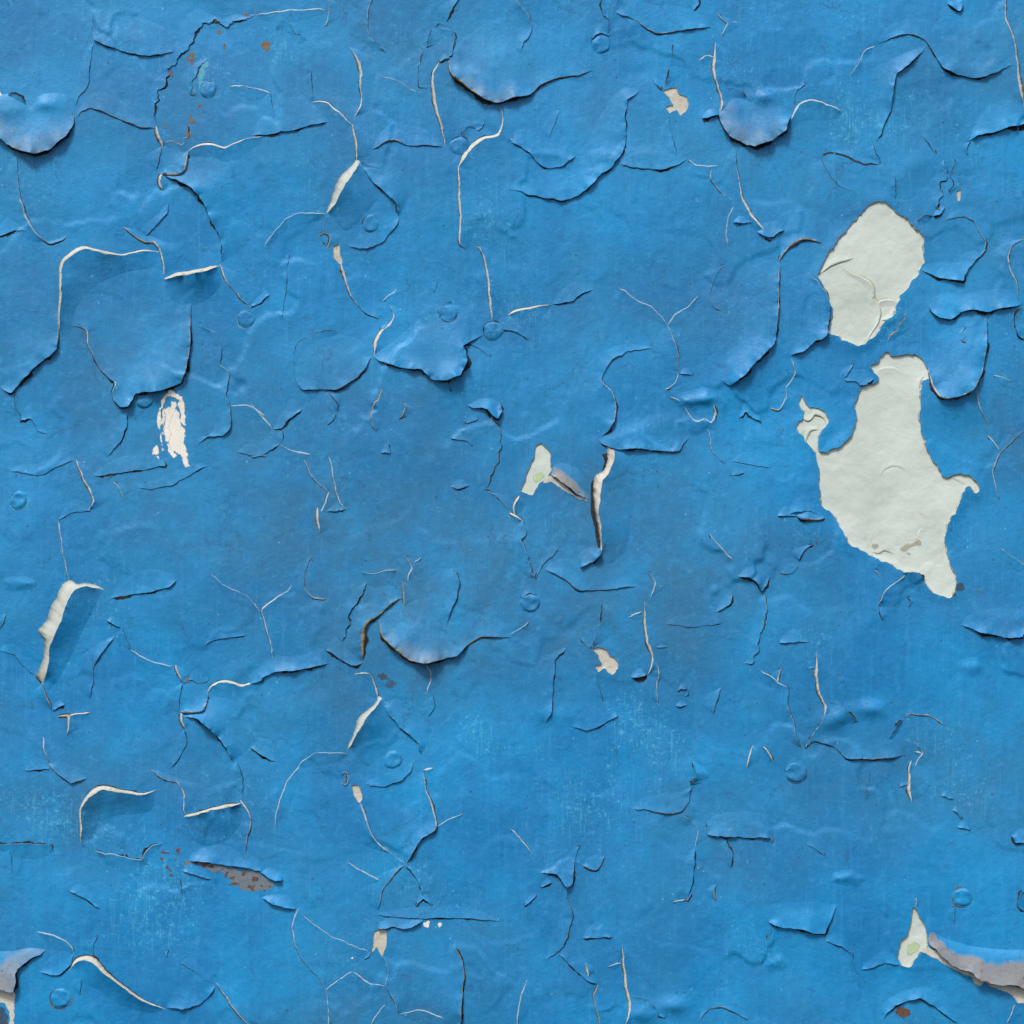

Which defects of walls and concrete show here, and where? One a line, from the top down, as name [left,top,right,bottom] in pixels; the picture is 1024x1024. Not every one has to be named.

crack [71,0,593,358]
peeling [663,88,689,115]
crack [917,0,1024,340]
peeling [521,344,690,564]
peeling [714,201,1023,598]
peeling [35,580,103,690]
crack [0,324,460,814]
peeling [592,647,618,674]
crack [450,415,858,772]
rust [160,848,274,892]
crack [180,742,500,922]
peeling [897,907,1024,1003]